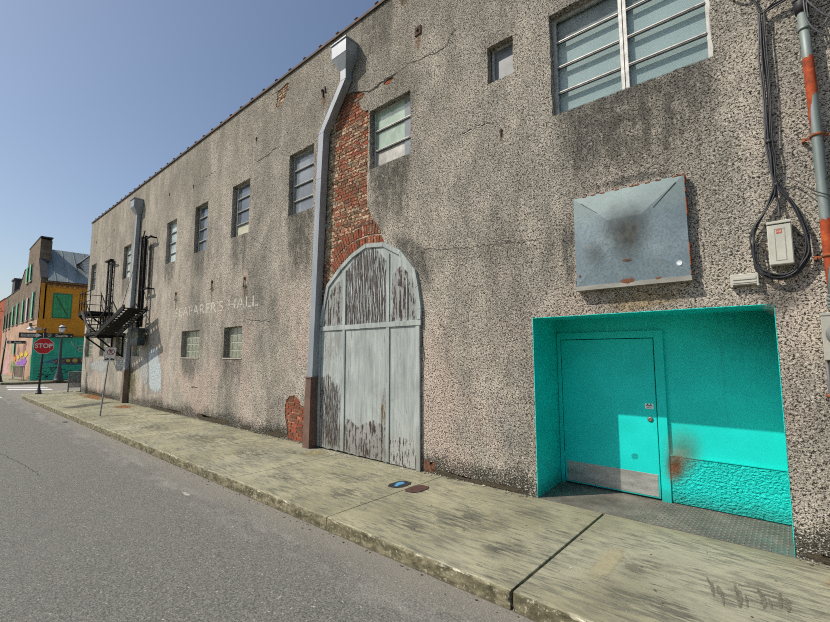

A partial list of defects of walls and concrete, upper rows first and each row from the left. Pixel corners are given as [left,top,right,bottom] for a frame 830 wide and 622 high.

crack [349,28,456,95]
water stain [568,63,696,163]
rust [802,54,818,128]
spalling [321,92,416,326]
rust [820,217,830,284]
spalling [240,396,304,442]
rust [670,448,687,474]